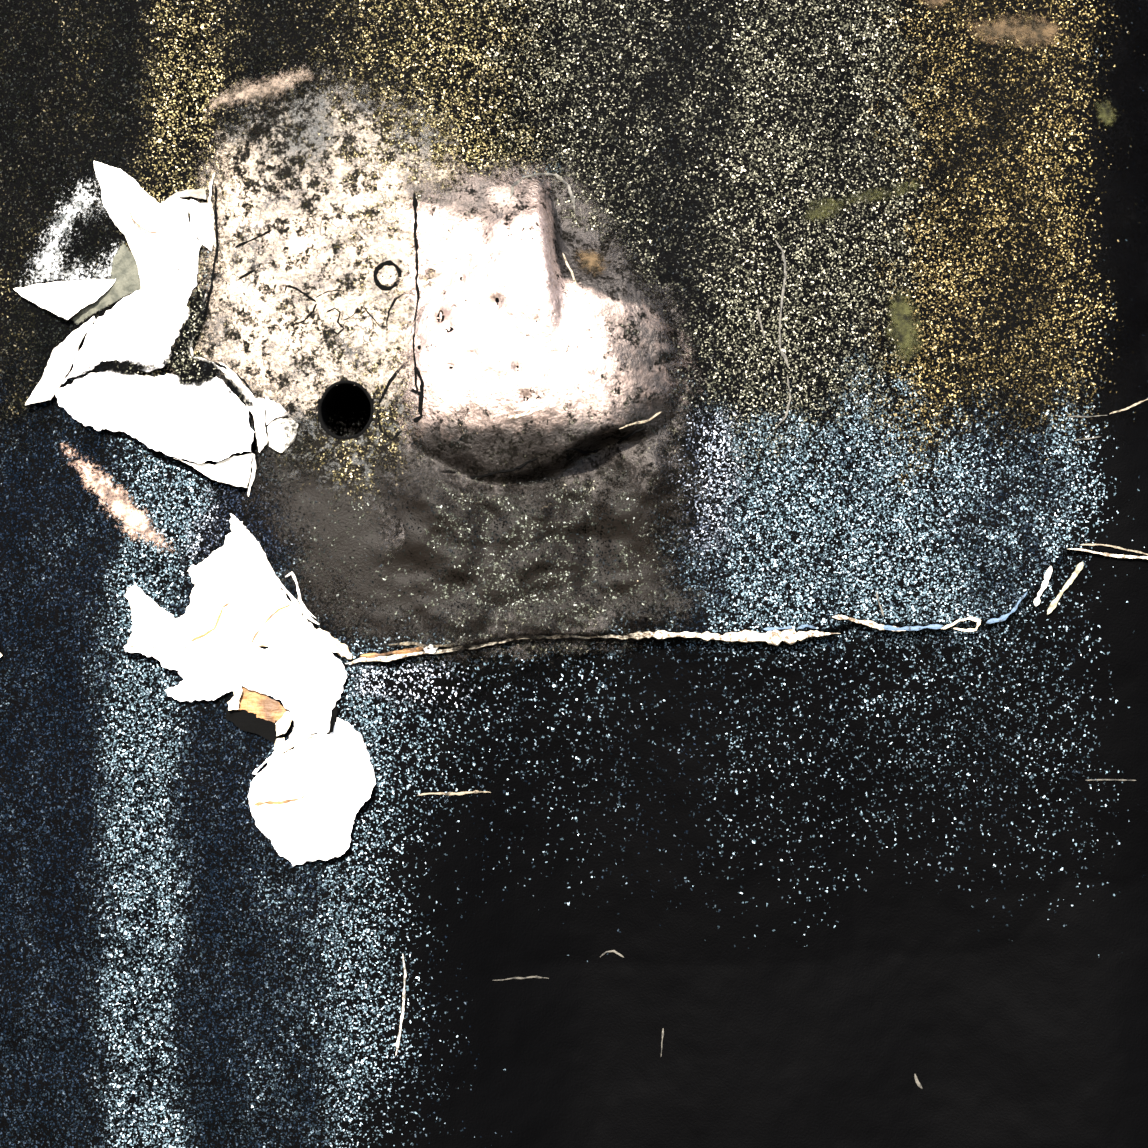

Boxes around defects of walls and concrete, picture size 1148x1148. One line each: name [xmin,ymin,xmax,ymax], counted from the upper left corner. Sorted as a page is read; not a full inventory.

spalling [14,70,460,501]
crack [284,193,426,441]
damp [182,475,304,563]
peeling [124,513,376,866]
crack [345,592,1027,664]
crack [1071,544,1148,560]